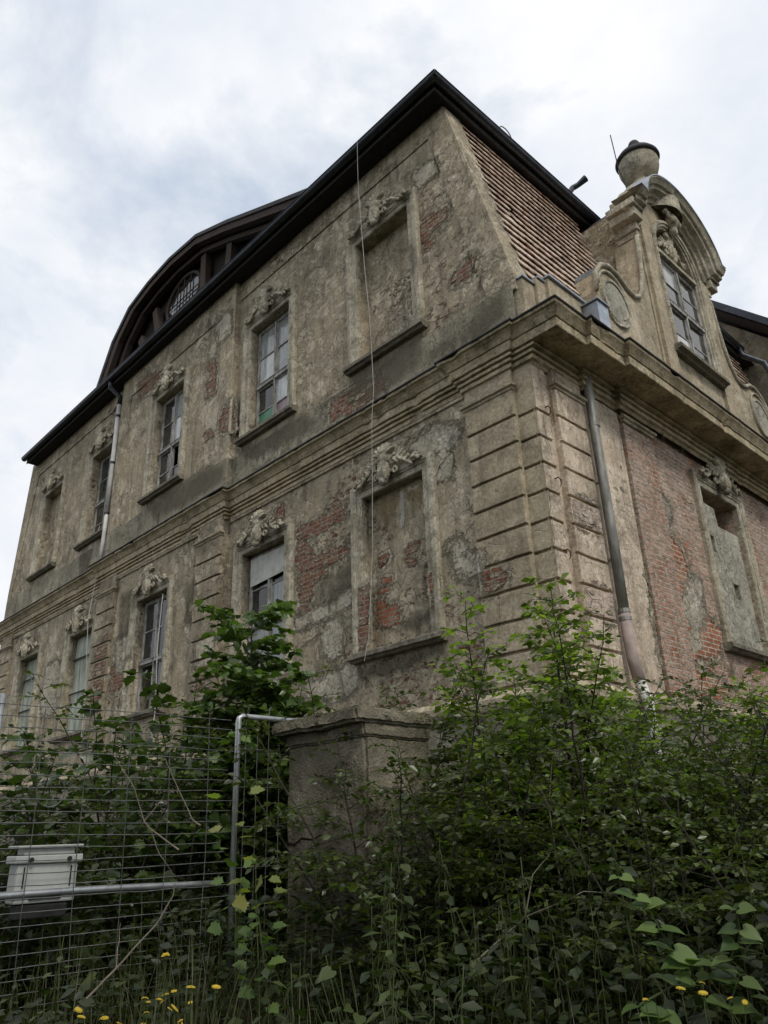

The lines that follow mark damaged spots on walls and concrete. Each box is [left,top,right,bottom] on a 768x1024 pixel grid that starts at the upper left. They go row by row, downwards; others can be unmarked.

spalling [419,199,452,254]
spalling [203,308,240,445]
spalling [326,368,393,427]
flaking render [613,465,641,546]
flaking render [293,494,516,708]
spalling [642,561,664,671]
spalling [661,488,732,706]